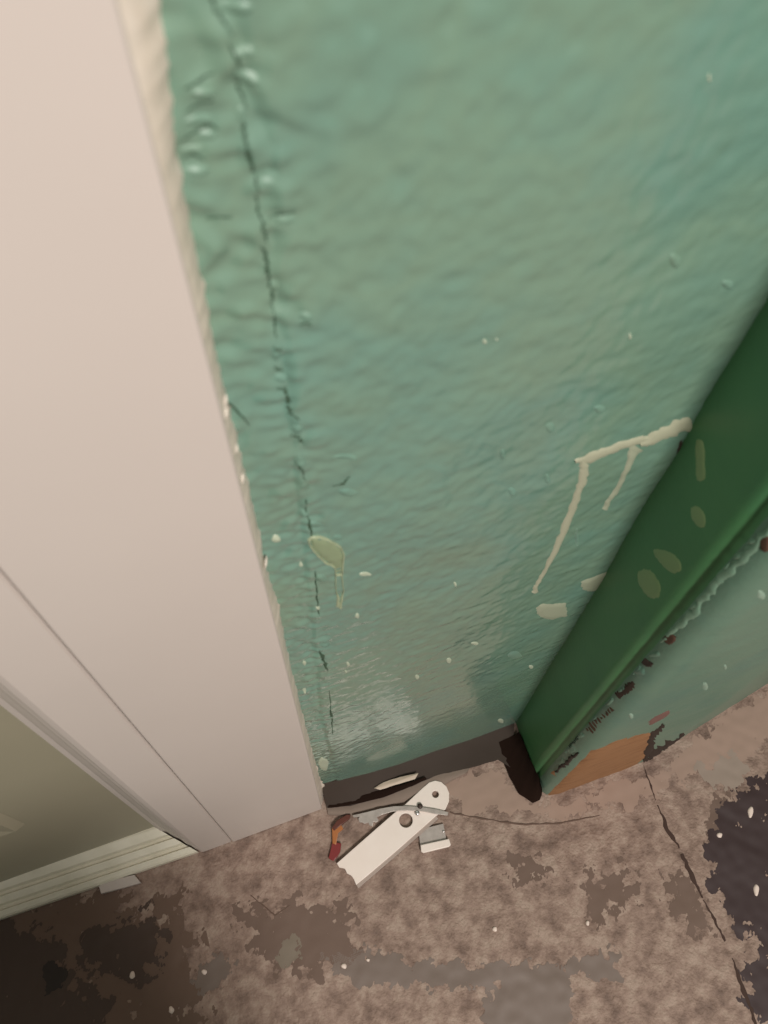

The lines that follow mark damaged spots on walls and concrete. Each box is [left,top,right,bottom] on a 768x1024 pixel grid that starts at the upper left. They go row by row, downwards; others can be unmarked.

crack [211,0,313,544]
crack [313,572,321,614]
crack [319,650,333,734]
spalling [568,681,635,747]
spalling [327,768,470,816]
hole [499,732,542,803]
crack [643,765,757,1024]